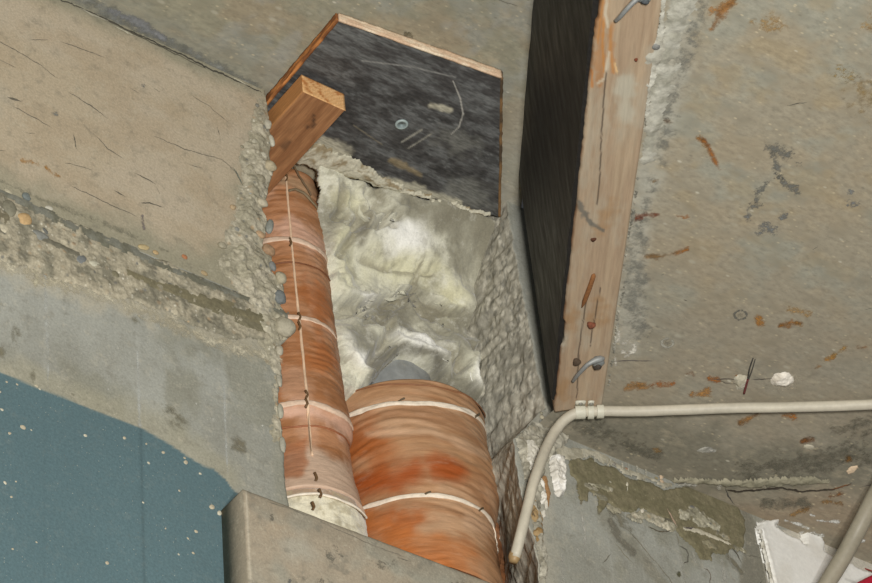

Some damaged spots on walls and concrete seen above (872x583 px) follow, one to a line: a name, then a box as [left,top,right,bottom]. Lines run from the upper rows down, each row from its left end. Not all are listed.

corrosion [708,0,735,30]
water stain [744,146,800,218]
spalling [0,93,296,453]
crack [672,475,871,505]
peeling [606,504,747,553]